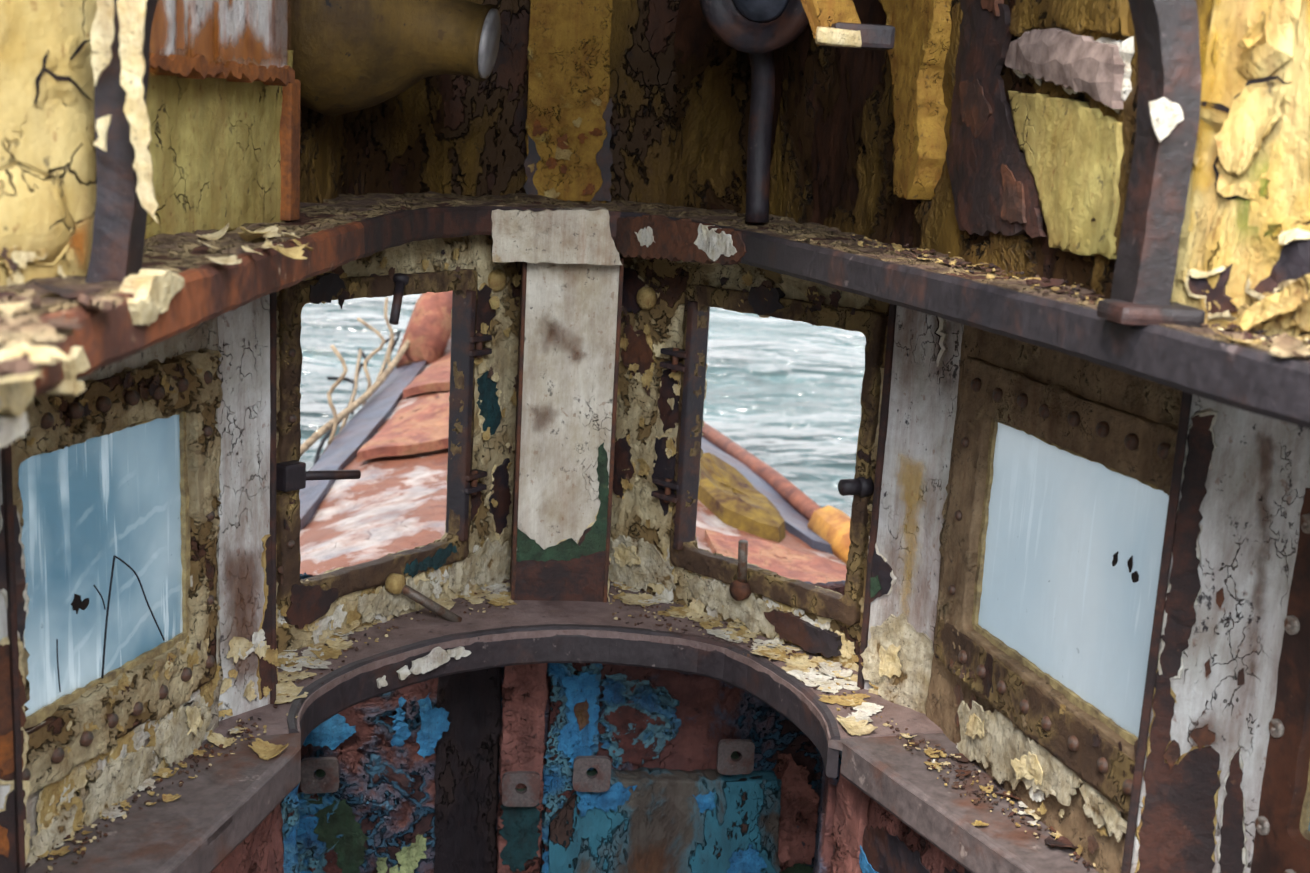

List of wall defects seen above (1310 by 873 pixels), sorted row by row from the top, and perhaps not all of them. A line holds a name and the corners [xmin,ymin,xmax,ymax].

crack [34,40,93,115]
corrosion [149,0,287,68]
peeling [1237,10,1266,48]
peeling [1215,83,1287,175]
peeling [0,246,127,382]
peeling [302,257,395,310]
peeling [404,264,1107,873]
peeling [0,505,450,873]